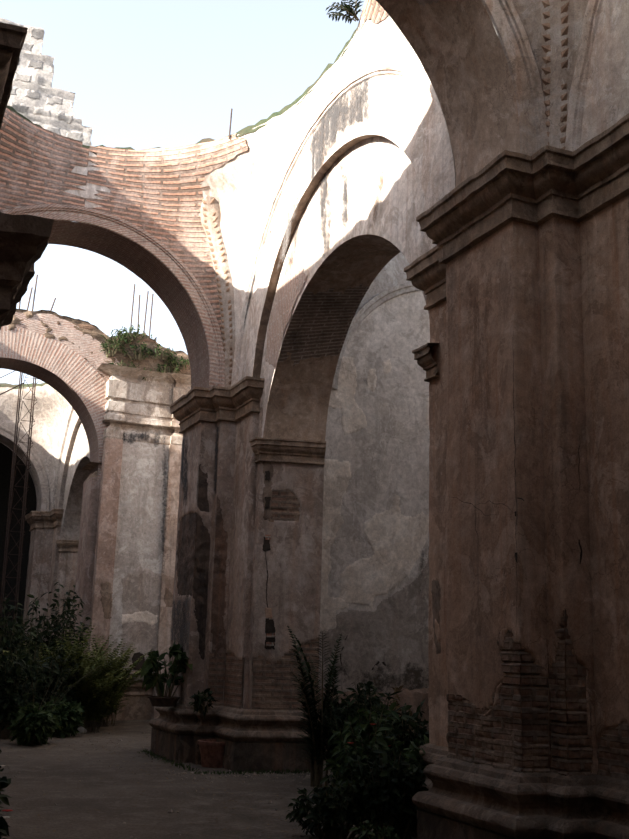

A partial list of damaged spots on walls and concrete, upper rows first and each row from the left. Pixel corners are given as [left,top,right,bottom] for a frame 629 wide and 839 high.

water stain [281,78,369,261]
flaking render [262,462,300,522]
crack [452,353,524,576]
spalling [176,464,229,660]
spalling [262,534,271,551]
spalling [100,581,113,619]
flaking render [121,611,158,626]
spalling [265,607,276,650]
spalling [446,628,551,773]